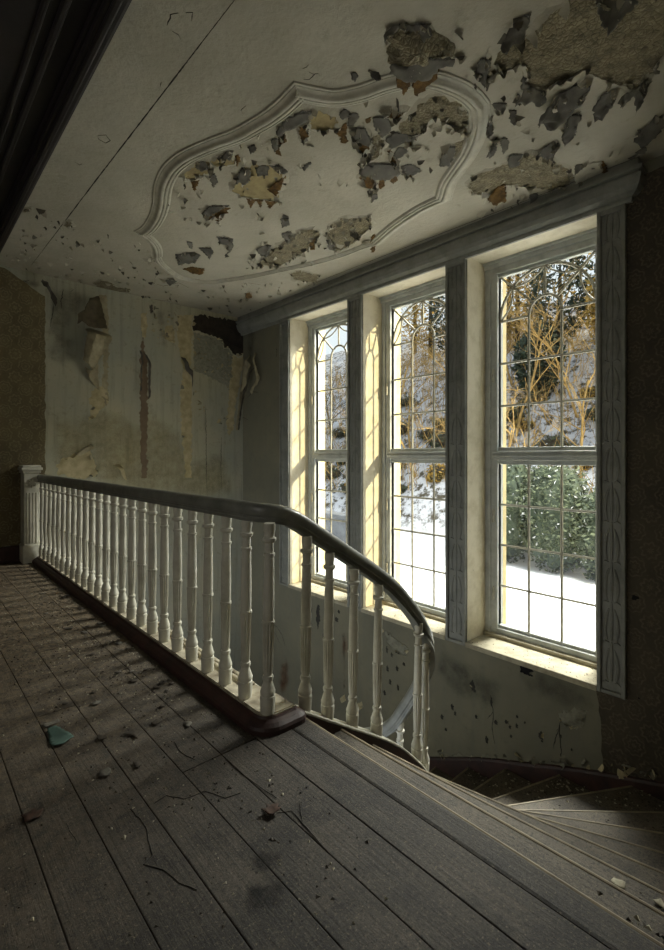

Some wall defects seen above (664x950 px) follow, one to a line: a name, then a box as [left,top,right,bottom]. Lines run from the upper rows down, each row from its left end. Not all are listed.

peeling [453,0,664,218]
peeling [6,206,179,304]
peeling [168,93,472,358]
spalling [518,665,536,679]